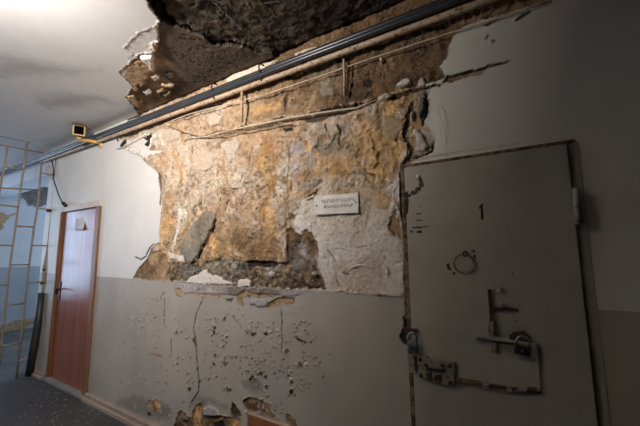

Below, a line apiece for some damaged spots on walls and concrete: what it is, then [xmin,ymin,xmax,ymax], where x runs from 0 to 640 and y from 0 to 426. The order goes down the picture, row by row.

peeling [21,187,48,207]
peeling [118,0,547,308]
crack [192,297,204,393]
spalling [174,397,275,426]